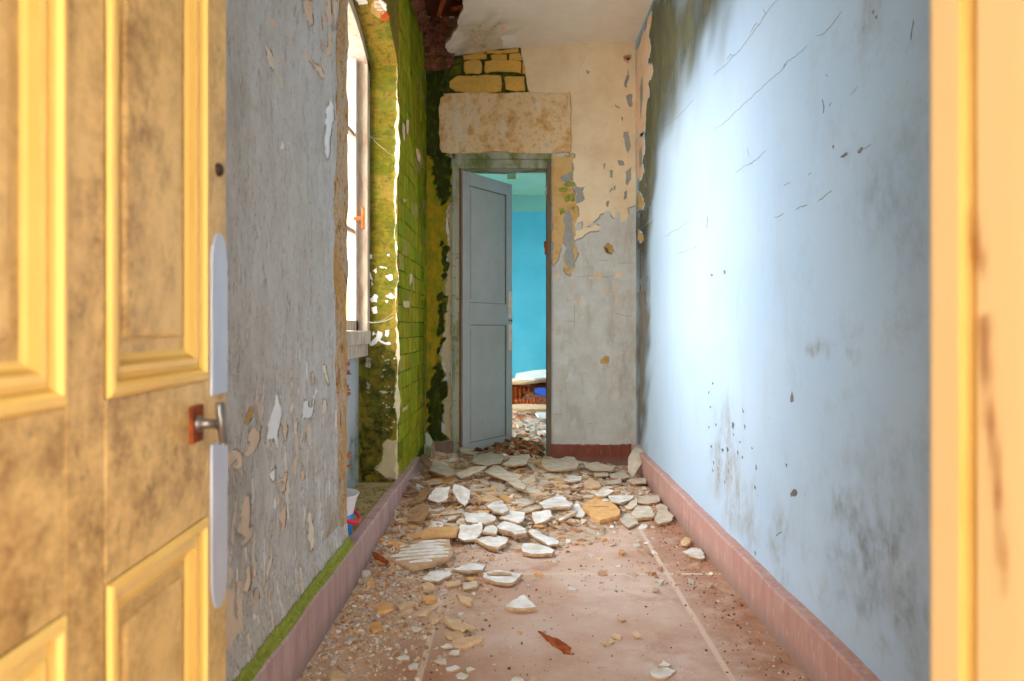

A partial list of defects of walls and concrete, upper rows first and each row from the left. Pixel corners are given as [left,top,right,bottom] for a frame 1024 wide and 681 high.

crack [714,1,776,75]
crack [715,12,841,129]
peeling [228,0,654,532]
damp [636,0,719,445]
peeling [226,559,260,660]